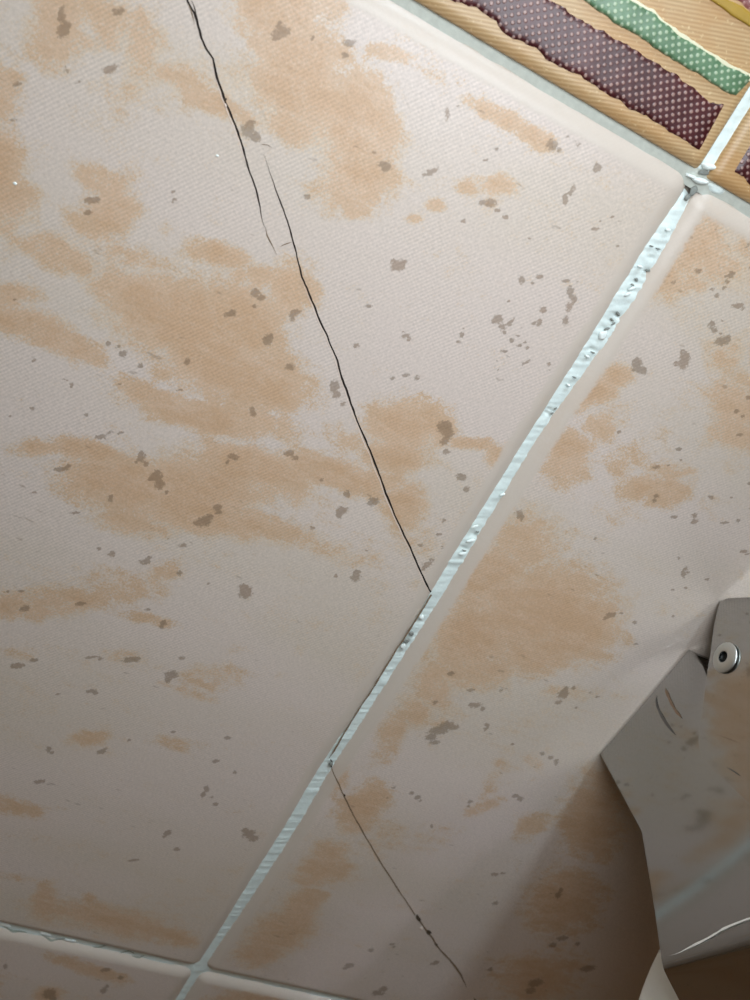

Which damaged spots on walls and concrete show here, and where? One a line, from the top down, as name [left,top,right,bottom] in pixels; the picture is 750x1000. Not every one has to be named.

crack [186,0,476,1000]